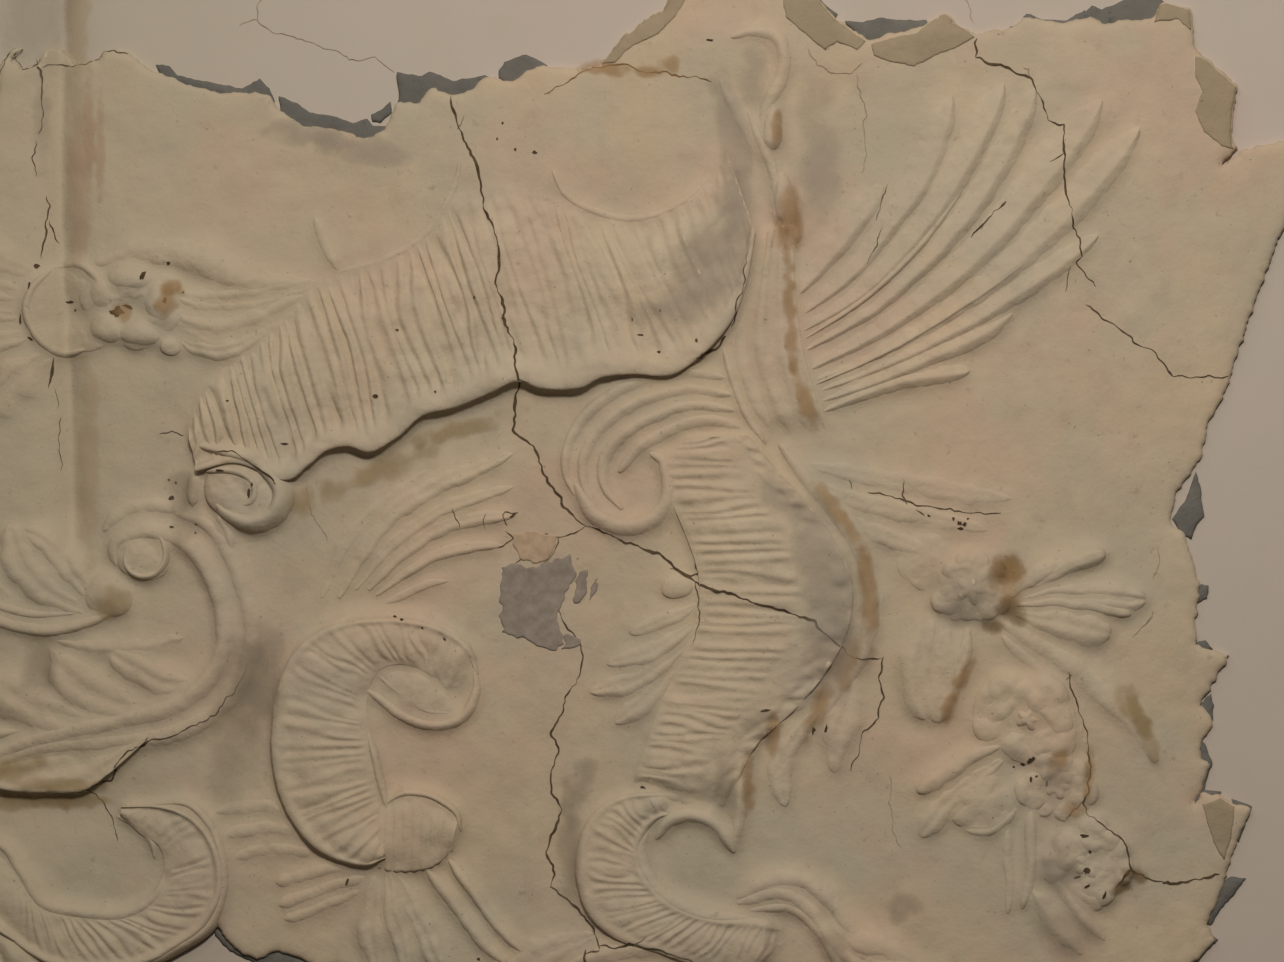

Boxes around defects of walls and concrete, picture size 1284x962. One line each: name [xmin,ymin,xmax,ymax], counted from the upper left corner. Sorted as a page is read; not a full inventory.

crack [0,49,127,254]
peeling [156,55,547,138]
crack [808,49,887,264]
flaking render [783,0,974,66]
crack [966,0,1228,378]
peeling [1011,0,1191,30]
flaking render [1195,56,1236,149]
crack [48,358,63,468]
crack [450,96,885,768]
peeling [573,569,598,603]
crack [545,611,693,962]
crack [1066,673,1220,888]